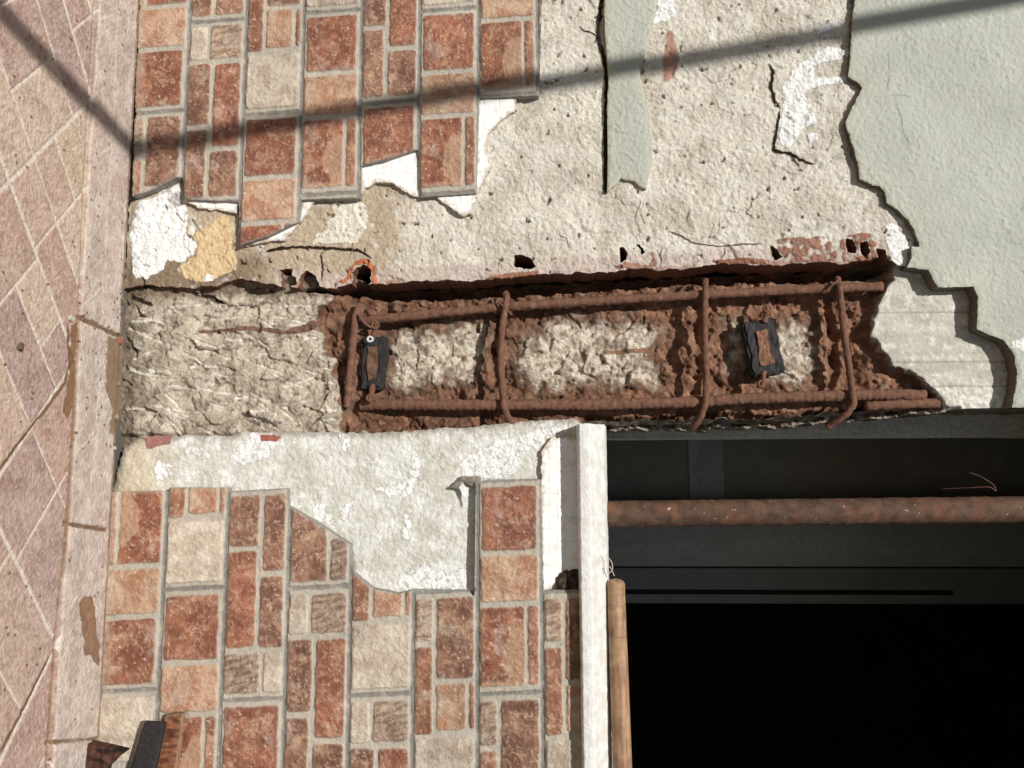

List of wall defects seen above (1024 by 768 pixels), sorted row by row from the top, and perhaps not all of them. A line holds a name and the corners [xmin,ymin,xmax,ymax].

crack [579,0,608,195]
peeling [604,0,676,193]
crack [769,64,814,168]
peeling [778,46,849,147]
crack [132,286,158,305]
crack [193,291,224,304]
spalling [119,184,369,468]
crack [245,287,274,295]
corrosion [199,270,941,433]
spalling [339,223,950,433]
peeling [458,424,568,506]
peeling [398,563,470,591]